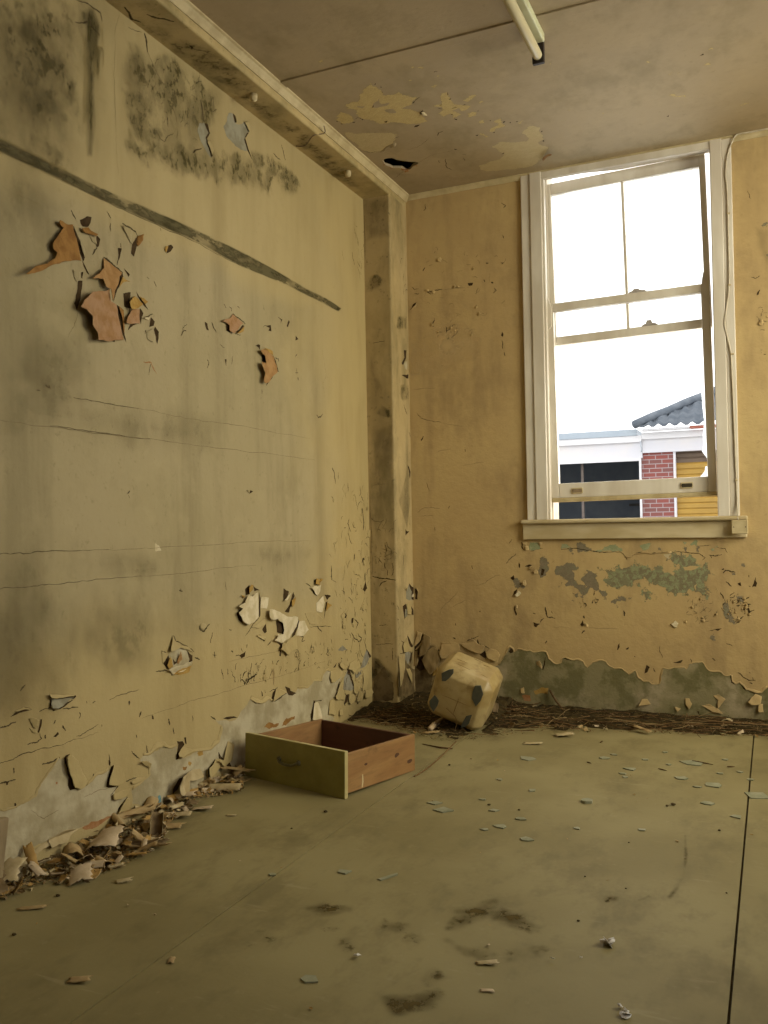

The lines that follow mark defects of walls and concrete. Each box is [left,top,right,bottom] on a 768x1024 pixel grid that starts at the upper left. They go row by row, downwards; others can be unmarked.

water stain [76,0,102,128]
water stain [135,62,212,124]
peeling [224,113,252,156]
peeling [336,83,551,171]
water stain [0,140,341,311]
peeling [27,210,159,343]
peeling [224,314,245,335]
peeling [256,344,279,386]
peeling [237,578,332,656]
flaking render [397,584,768,737]
peeling [511,540,757,633]
flaking render [0,633,373,882]